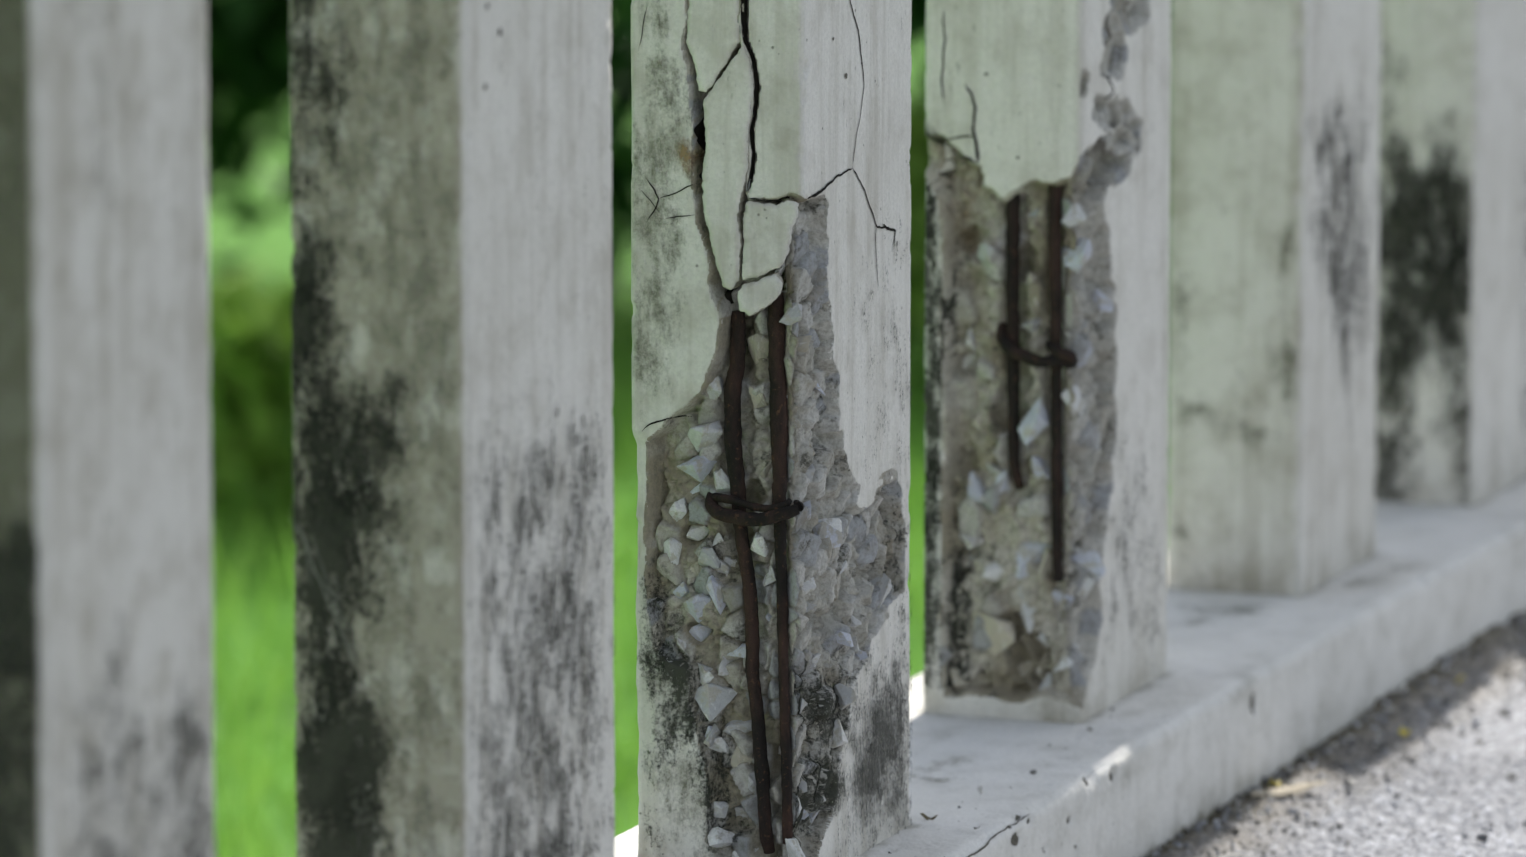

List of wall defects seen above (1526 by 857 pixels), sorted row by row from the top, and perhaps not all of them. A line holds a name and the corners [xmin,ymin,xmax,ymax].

leakage [0,0,219,857]
leakage [288,0,452,857]
leakage [455,380,618,857]
crack [642,108,706,221]
leakage [639,575,749,851]
crack [724,289,734,304]
spalling [643,0,905,857]
crack [741,0,896,280]
spalling [1006,815,1030,846]
spalling [925,0,1151,710]
leakage [1307,45,1489,504]